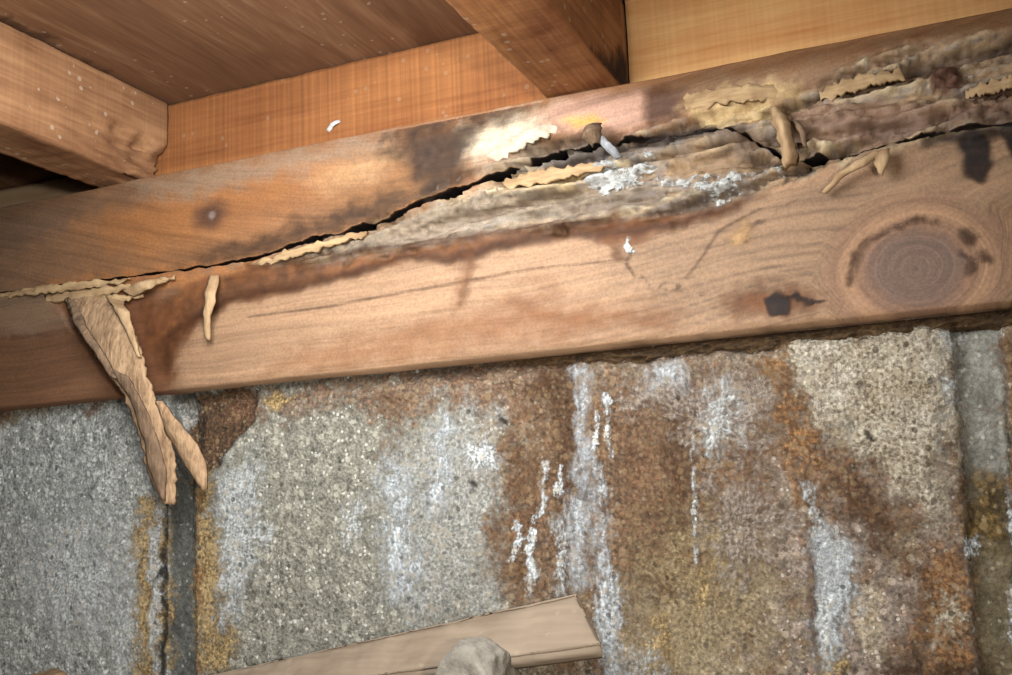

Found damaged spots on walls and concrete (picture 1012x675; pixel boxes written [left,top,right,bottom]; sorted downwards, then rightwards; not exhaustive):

leakage [387,114,478,191]
peeling [582,122,622,160]
leakage [246,194,405,251]
crack [624,237,635,264]
leakage [592,318,1009,557]
leakage [508,461,563,595]
leakage [551,515,569,590]
leakage [594,516,623,675]
leakage [714,484,795,575]
leakage [802,482,858,675]